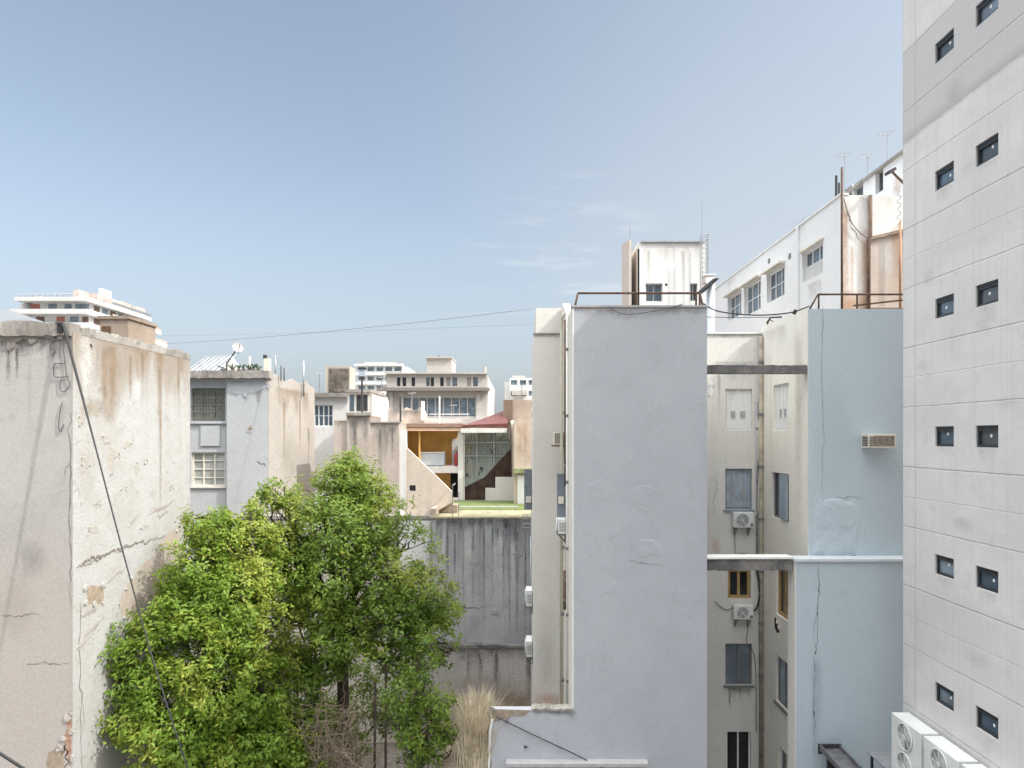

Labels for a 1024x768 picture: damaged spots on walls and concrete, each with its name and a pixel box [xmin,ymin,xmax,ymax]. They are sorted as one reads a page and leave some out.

damp [0,326,184,510]
spalling [46,711,75,768]
spalling [83,582,107,608]
crack [27,414,166,768]
damp [435,519,576,721]
crack [812,568,820,752]